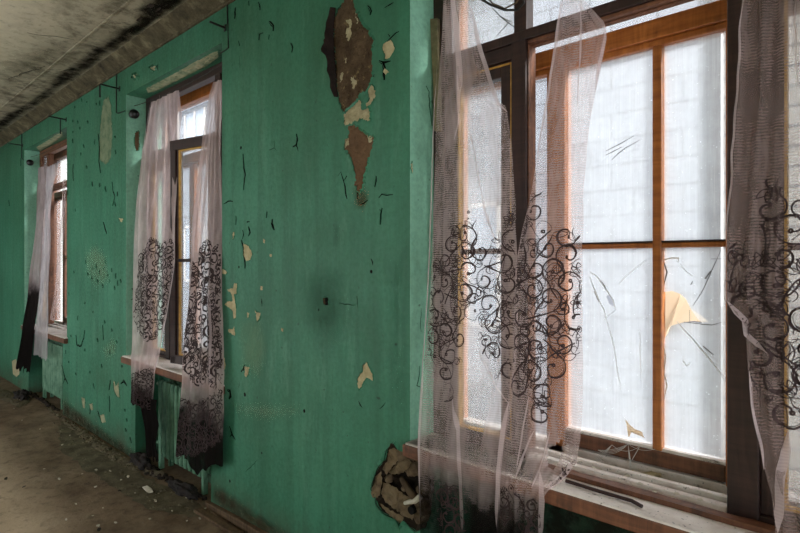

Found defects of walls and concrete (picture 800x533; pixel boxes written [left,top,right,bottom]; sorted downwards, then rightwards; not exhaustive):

damp [0,0,180,129]
spalling [321,0,396,195]
peeling [243,243,253,261]
peeling [224,283,238,336]
peeling [357,362,374,391]
spalling [370,441,432,532]